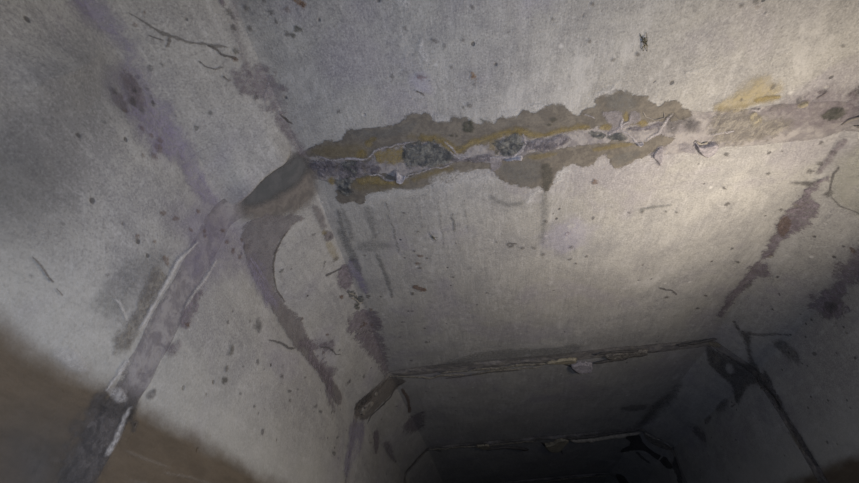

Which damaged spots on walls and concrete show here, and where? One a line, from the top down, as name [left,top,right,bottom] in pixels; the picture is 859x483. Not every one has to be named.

peeling [591,111,671,147]
peeling [681,140,719,158]